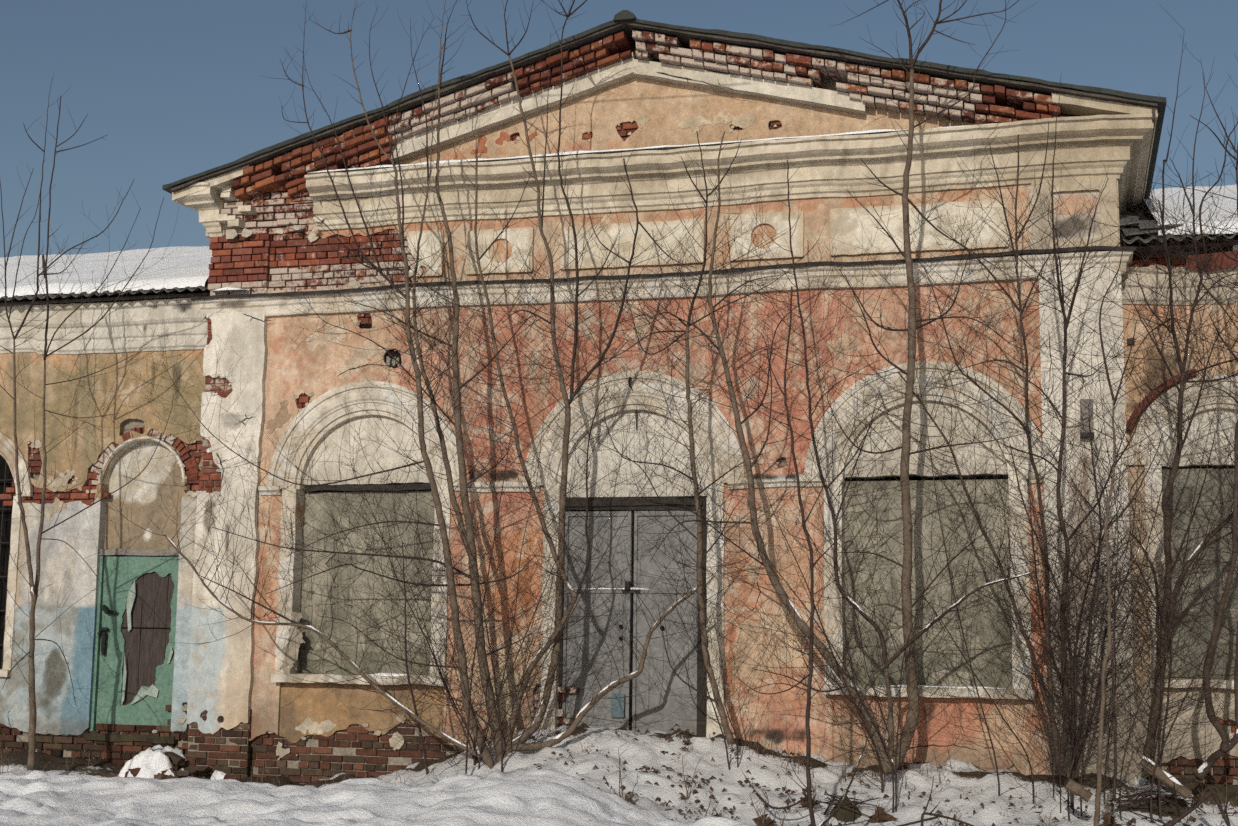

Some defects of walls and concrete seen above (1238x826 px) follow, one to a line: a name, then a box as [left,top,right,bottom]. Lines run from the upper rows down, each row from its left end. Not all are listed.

flaking render [205,30,1064,296]
flaking render [205,373,235,397]
peeling [266,392,314,434]
flaking render [0,427,222,520]
leakage [43,651,64,706]
flaking render [0,702,464,783]
flaking render [1147,717,1238,785]